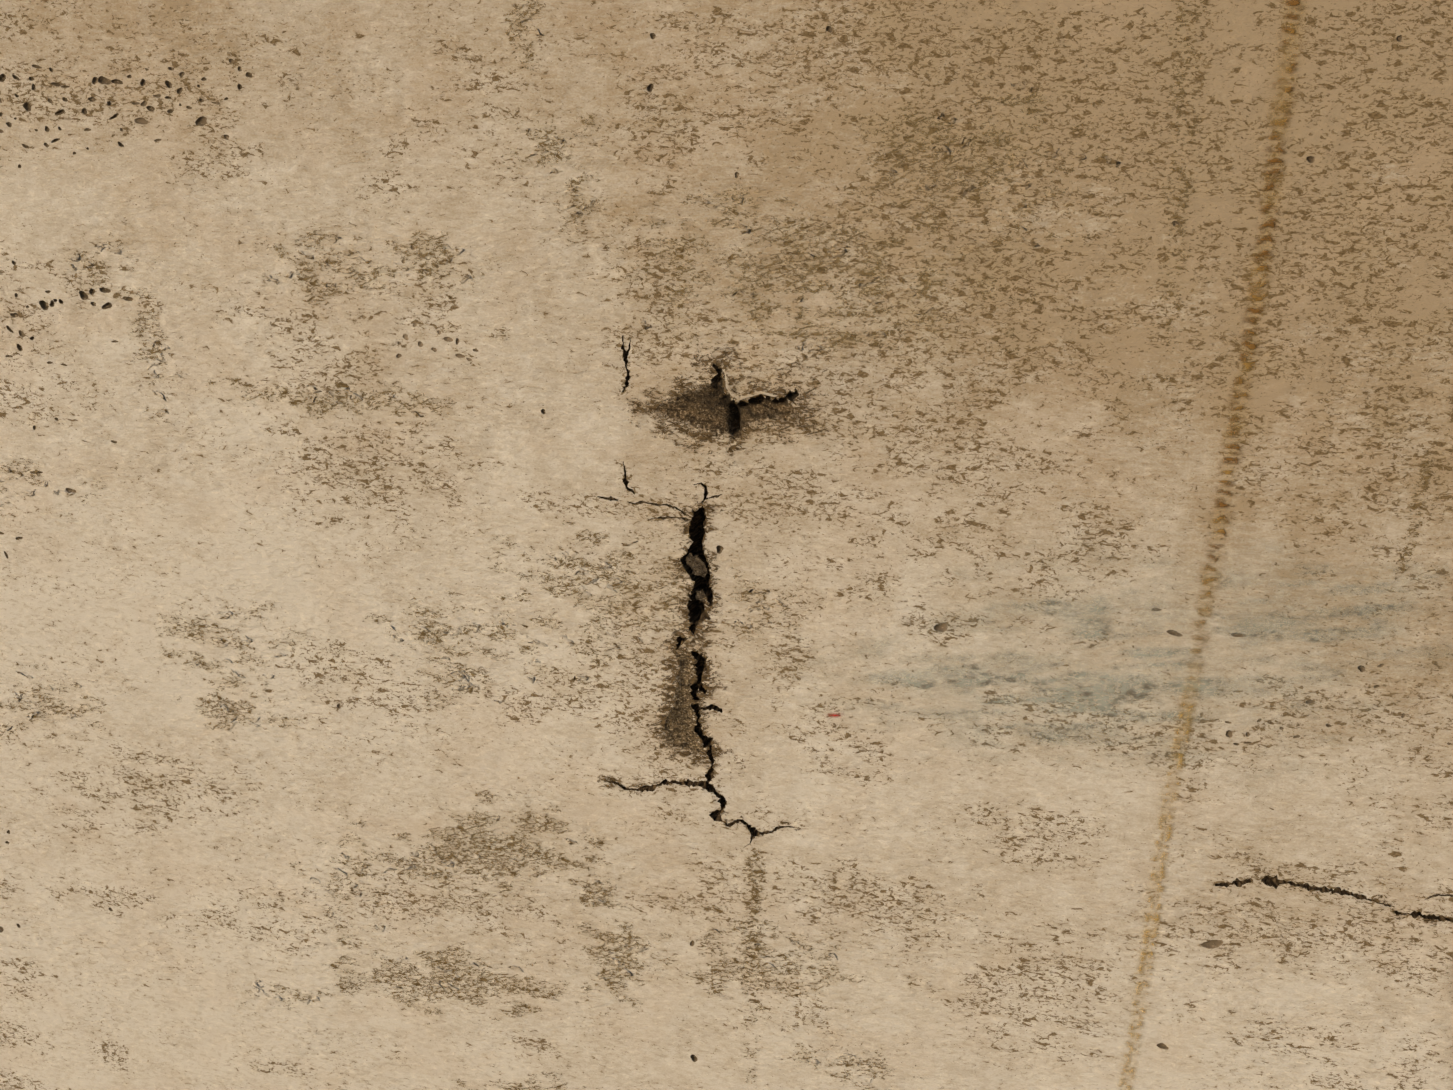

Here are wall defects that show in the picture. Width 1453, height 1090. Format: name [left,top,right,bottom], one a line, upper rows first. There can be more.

rust [1283,0,1300,44]
rust [1199,119,1288,624]
crack [597,462,801,847]
crack [1215,872,1453,928]